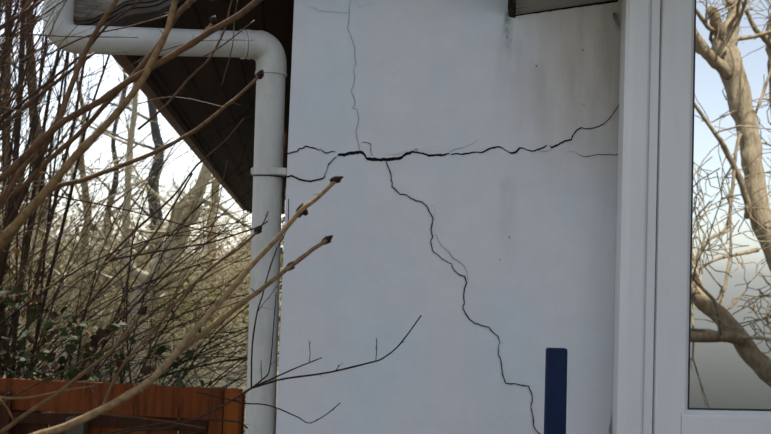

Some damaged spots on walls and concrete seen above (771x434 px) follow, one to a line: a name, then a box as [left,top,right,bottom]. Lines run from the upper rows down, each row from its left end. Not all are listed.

crack [282,0,619,434]